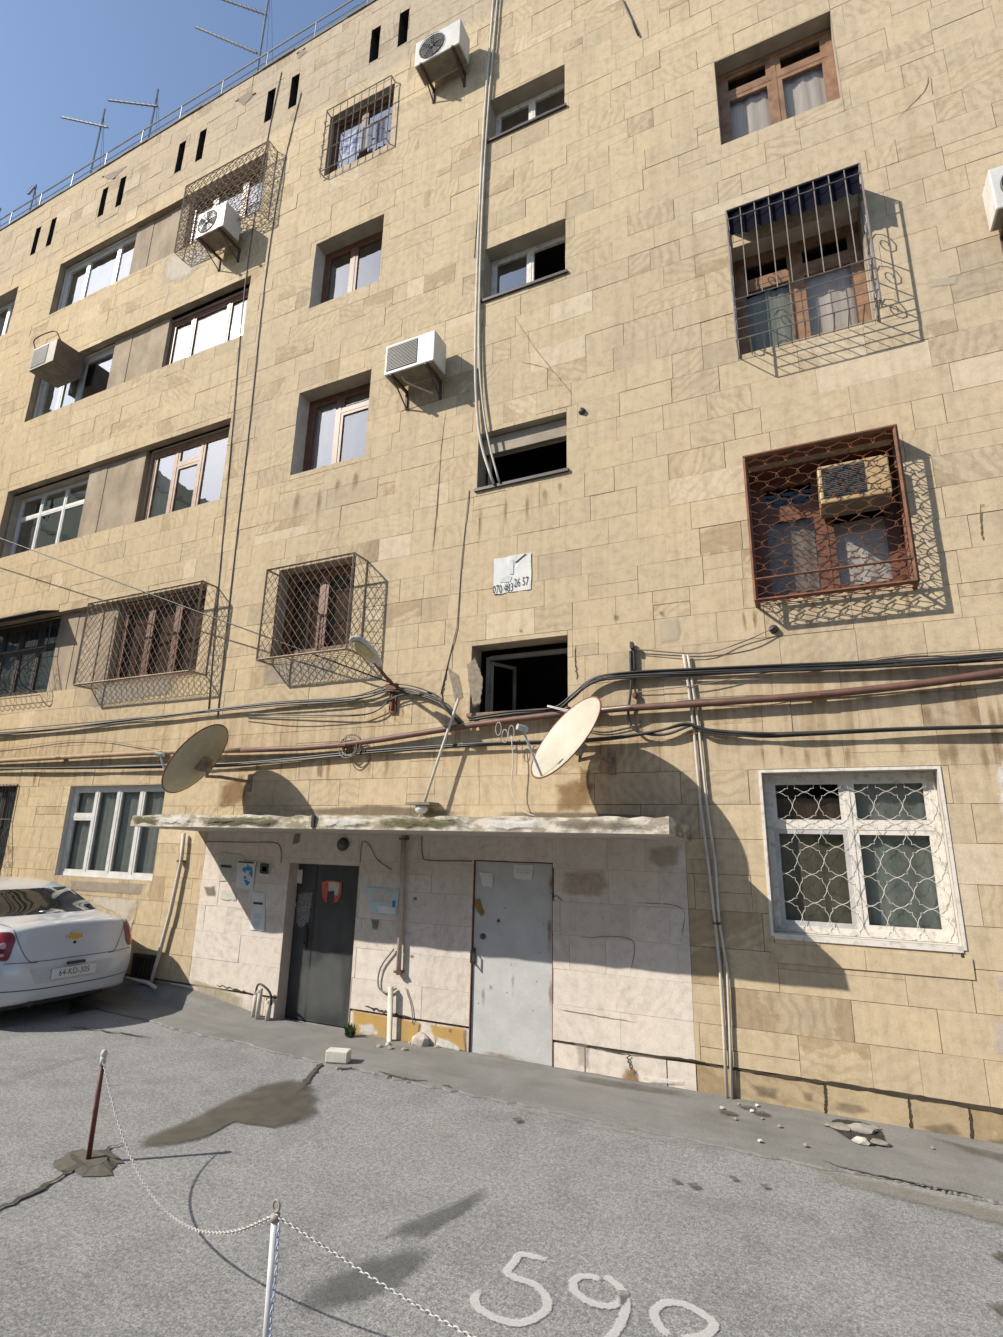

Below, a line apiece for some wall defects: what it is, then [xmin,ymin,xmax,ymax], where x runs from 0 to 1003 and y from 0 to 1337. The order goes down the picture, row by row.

flaking render [353,1010,465,1051]